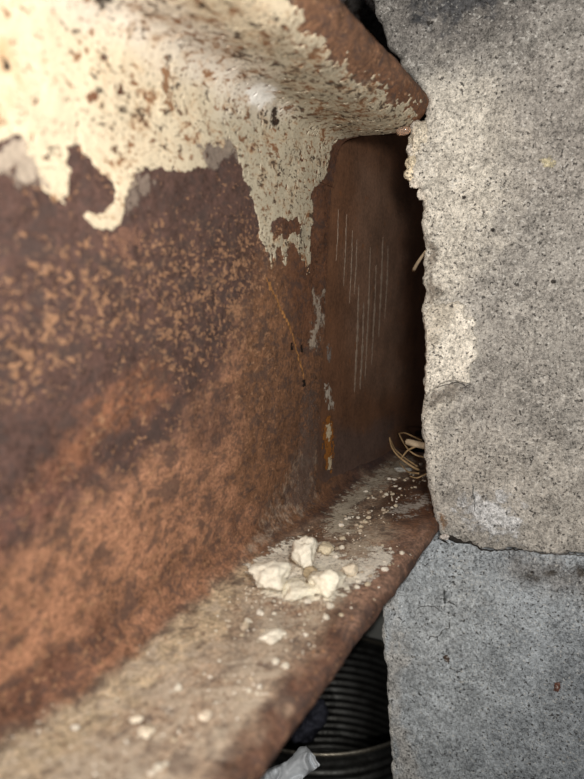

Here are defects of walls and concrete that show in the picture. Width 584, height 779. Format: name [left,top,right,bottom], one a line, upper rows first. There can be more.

peeling [0,0,422,275]
rust [321,415,335,473]